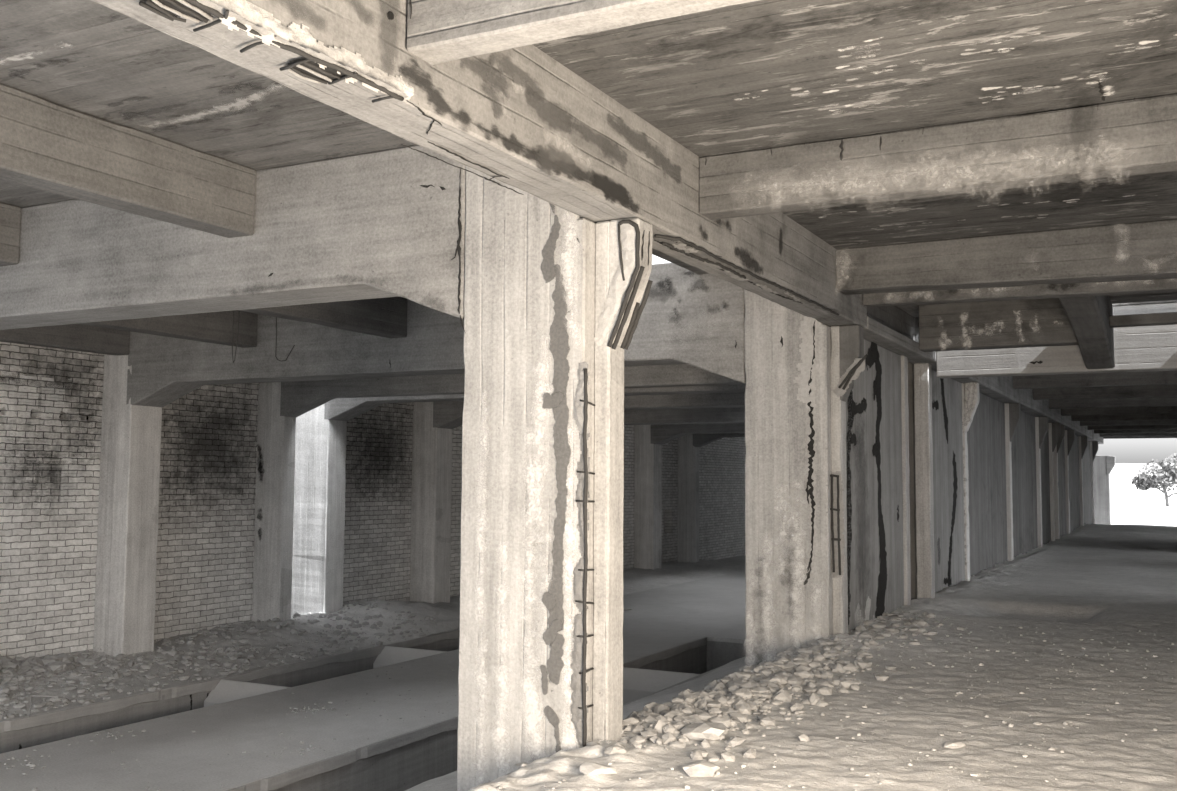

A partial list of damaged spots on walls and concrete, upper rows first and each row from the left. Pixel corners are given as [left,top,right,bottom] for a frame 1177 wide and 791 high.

spalling [135,0,414,103]
spalling [594,220,842,411]
crack [641,230,816,585]
spalling [833,355,867,396]
spalling [569,362,595,747]